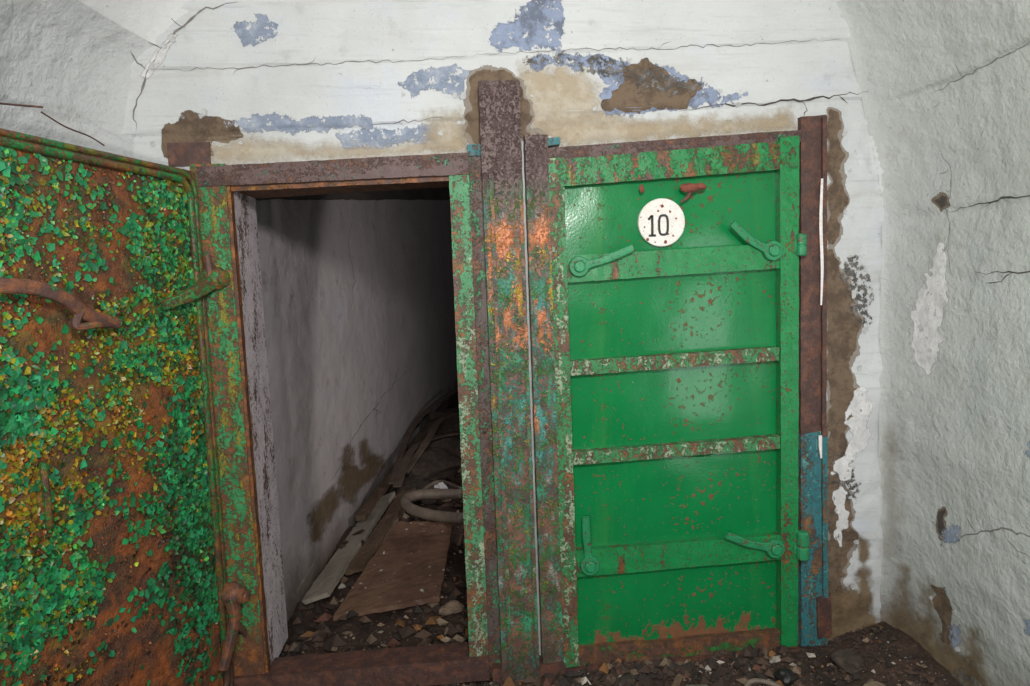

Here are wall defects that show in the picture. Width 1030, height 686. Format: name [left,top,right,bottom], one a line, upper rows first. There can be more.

flaking render [150,64,552,158]
peeling [489,0,748,118]
crack [940,153,1030,273]
crack [978,271,1030,283]
flaking render [826,107,874,595]
peeling [0,146,223,686]
water stain [308,440,383,542]
crack [956,520,1030,557]
corrosion [816,593,832,639]
water stain [828,539,986,686]